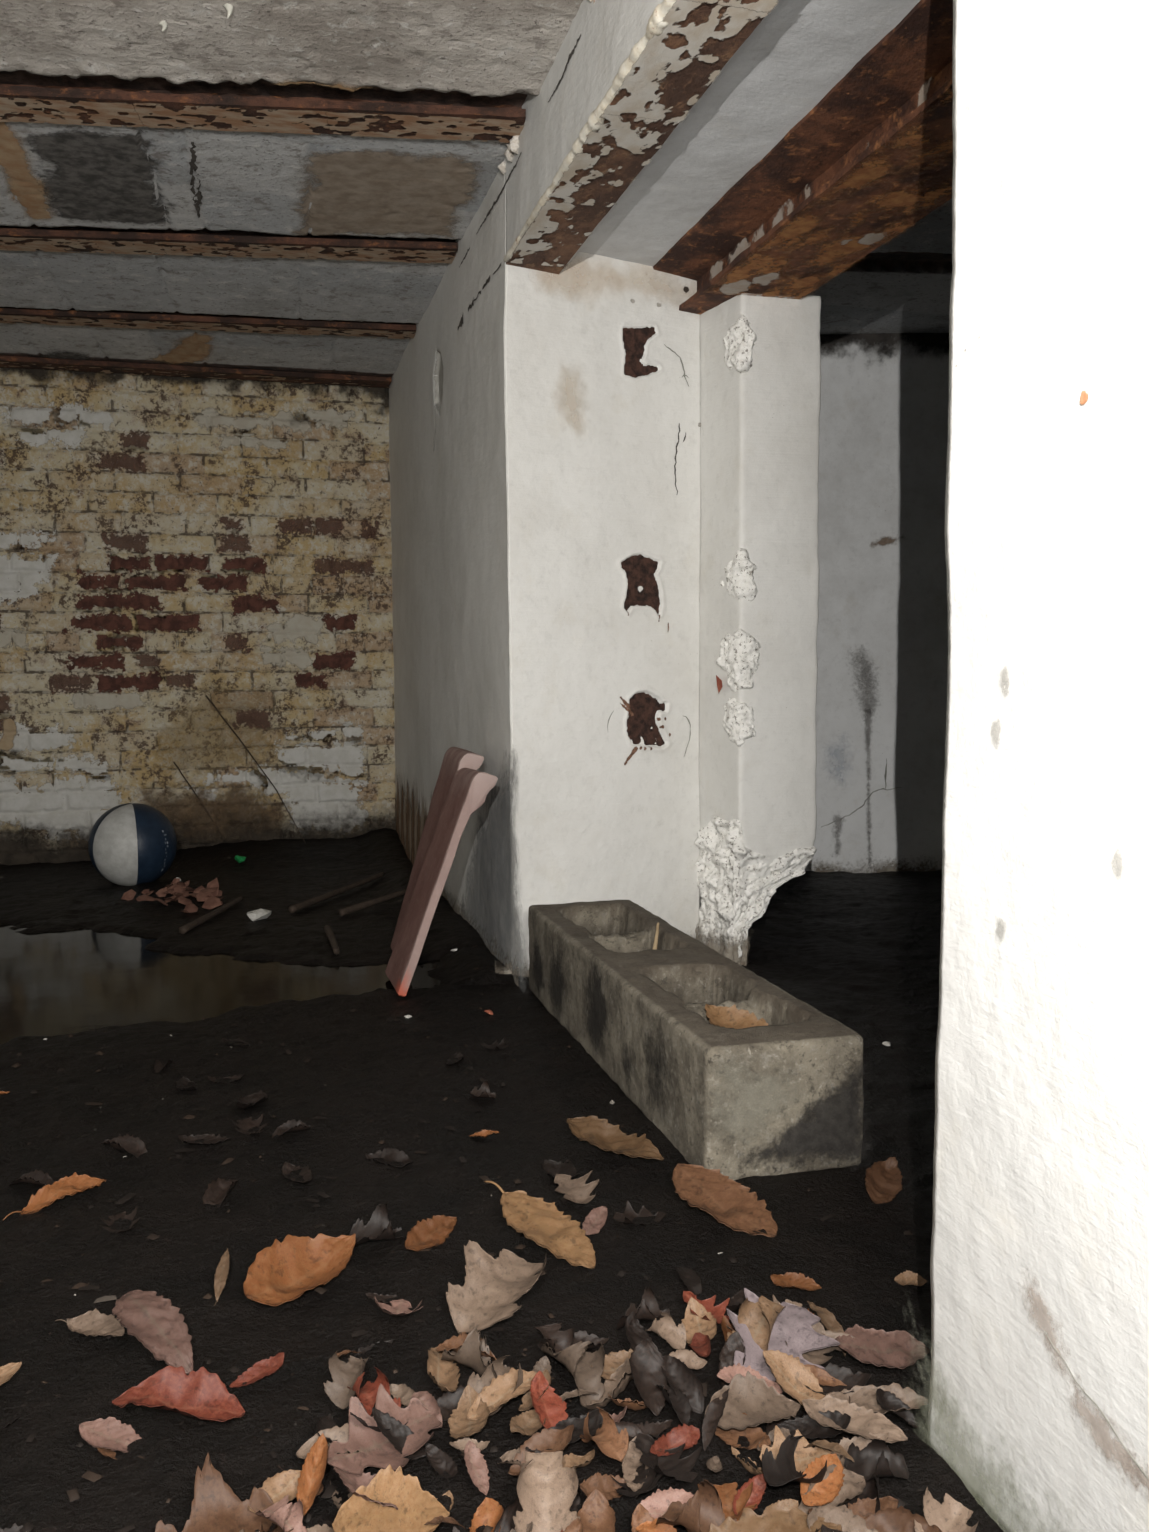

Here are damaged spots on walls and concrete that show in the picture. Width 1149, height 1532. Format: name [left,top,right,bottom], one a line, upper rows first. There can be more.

leakage [19,129,175,224]
corrosion [707,90,953,300]
peeling [0,401,151,476]
peeling [193,407,356,451]
peeling [0,526,59,650]
flaking render [46,516,357,710]
flaking render [275,516,383,579]
peeling [0,692,123,841]
peeling [184,706,375,830]
leakage [808,653,942,873]
crack [1044,1331,1149,1481]